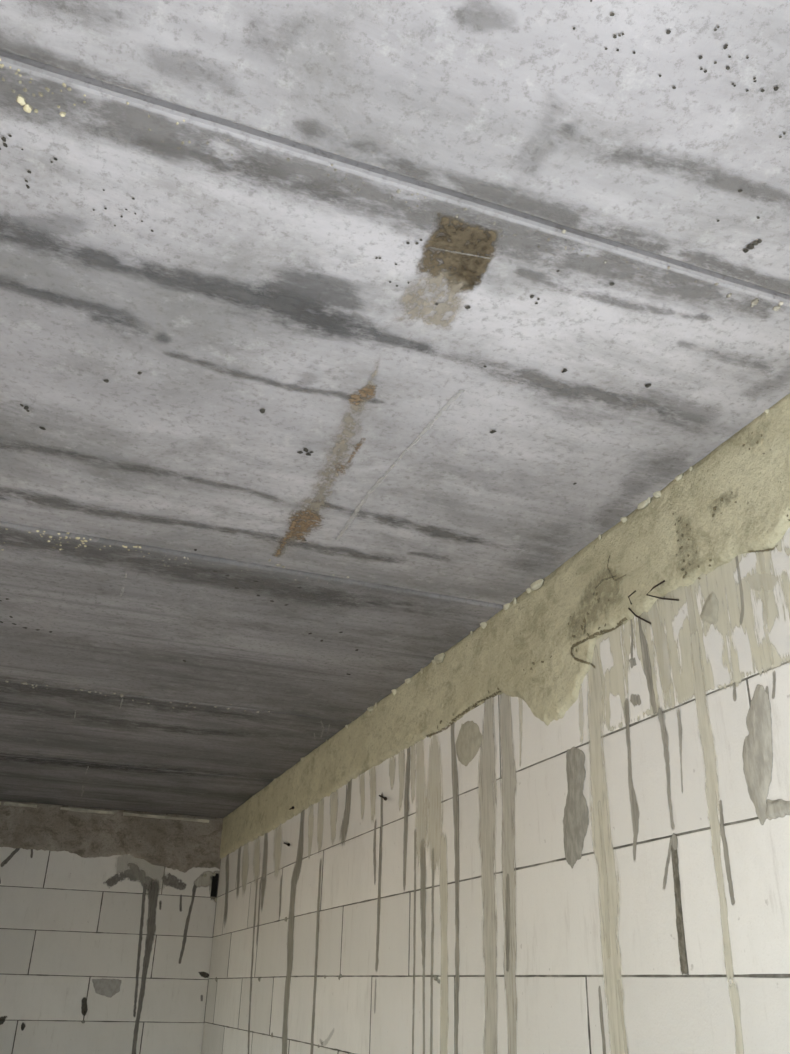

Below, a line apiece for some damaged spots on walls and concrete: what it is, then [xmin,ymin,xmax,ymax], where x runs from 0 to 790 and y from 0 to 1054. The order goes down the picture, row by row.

damp [0,488,393,562]
damp [0,218,430,353]
damp [159,335,384,403]
rust [274,371,377,557]
damp [0,59,790,314]
damp [358,511,481,543]
rust [401,214,497,327]
damp [497,371,651,410]
damp [105,863,197,1054]
damp [224,722,459,1054]
damp [478,693,522,1054]
damp [588,535,790,1054]